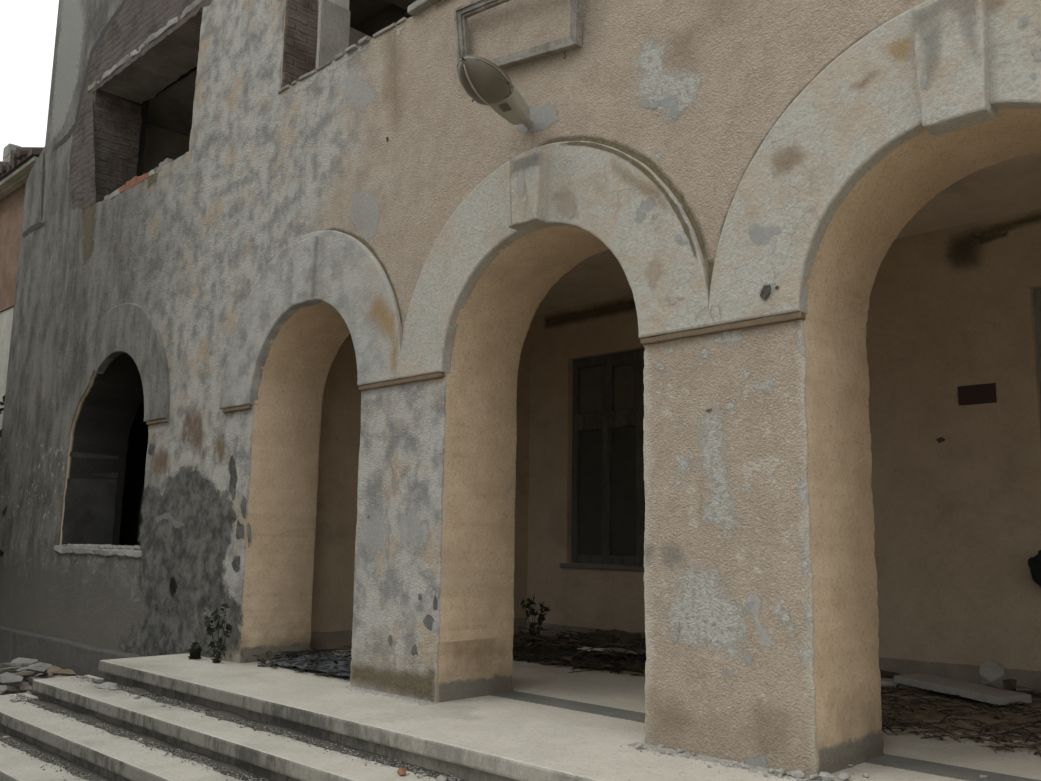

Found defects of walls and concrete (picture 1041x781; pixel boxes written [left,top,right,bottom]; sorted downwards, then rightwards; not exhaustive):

peeling [636,37,701,122]
peeling [675,402,753,535]
spalling [95,455,251,658]
peeling [659,567,771,676]